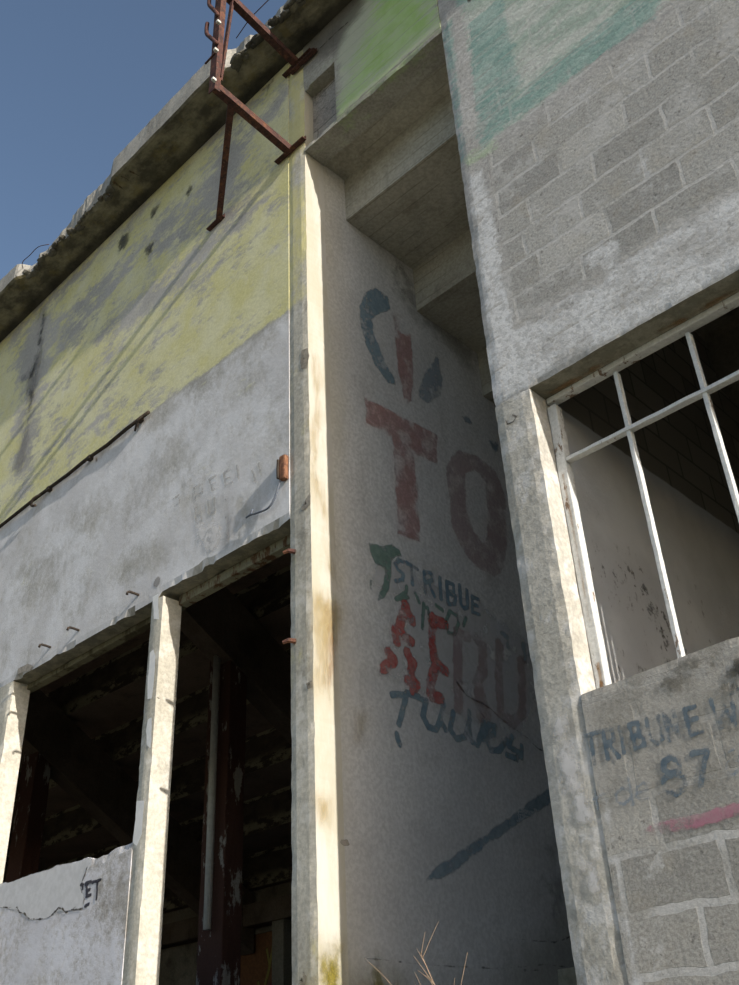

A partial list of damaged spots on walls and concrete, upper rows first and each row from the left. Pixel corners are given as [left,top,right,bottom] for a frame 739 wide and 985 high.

damp [28,330,42,399]
peeling [147,650,156,699]
peeling [133,801,144,846]
crack [3,868,87,920]
damp [329,961,337,985]